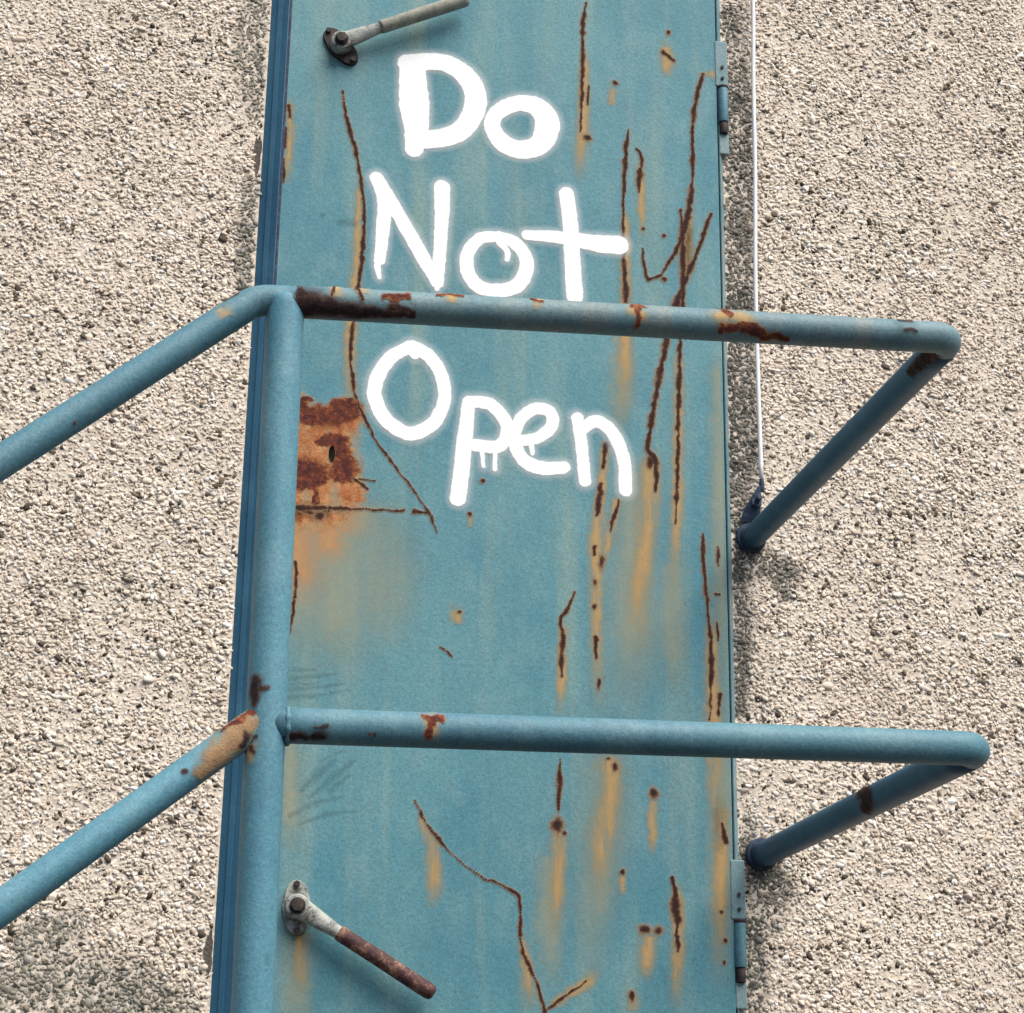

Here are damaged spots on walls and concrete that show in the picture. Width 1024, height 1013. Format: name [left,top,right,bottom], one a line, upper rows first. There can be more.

rust [293,286,416,319]
rust [715,308,790,342]
rust [906,353,938,378]
rust [292,395,429,587]
rust [589,441,620,690]
rust [648,787,659,843]
rust [856,785,873,815]
rust [639,875,684,989]